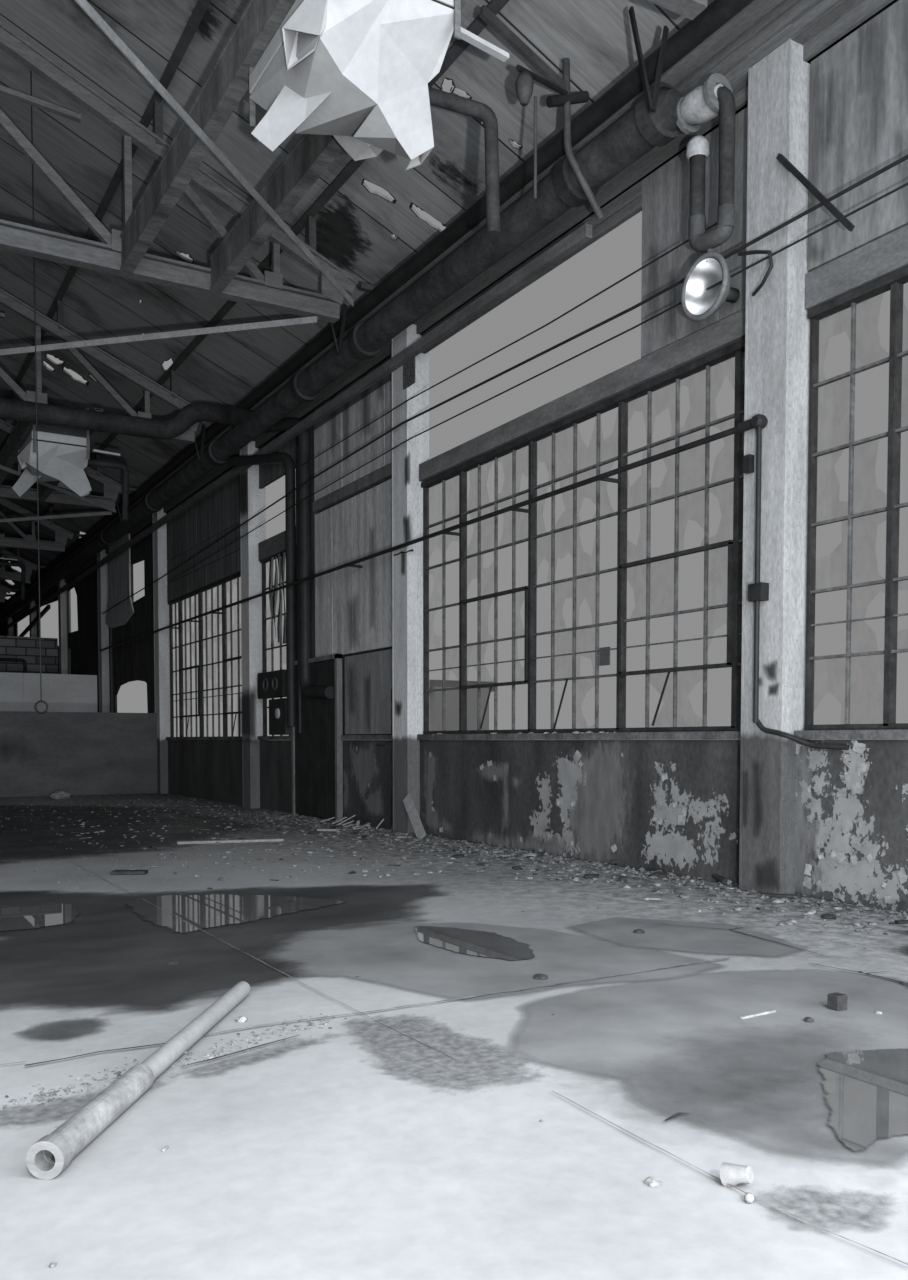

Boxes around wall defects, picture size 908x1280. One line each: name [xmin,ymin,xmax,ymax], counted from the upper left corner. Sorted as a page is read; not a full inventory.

peeling [473,731,632,864]
peeling [641,761,738,872]
peeling [795,740,908,912]